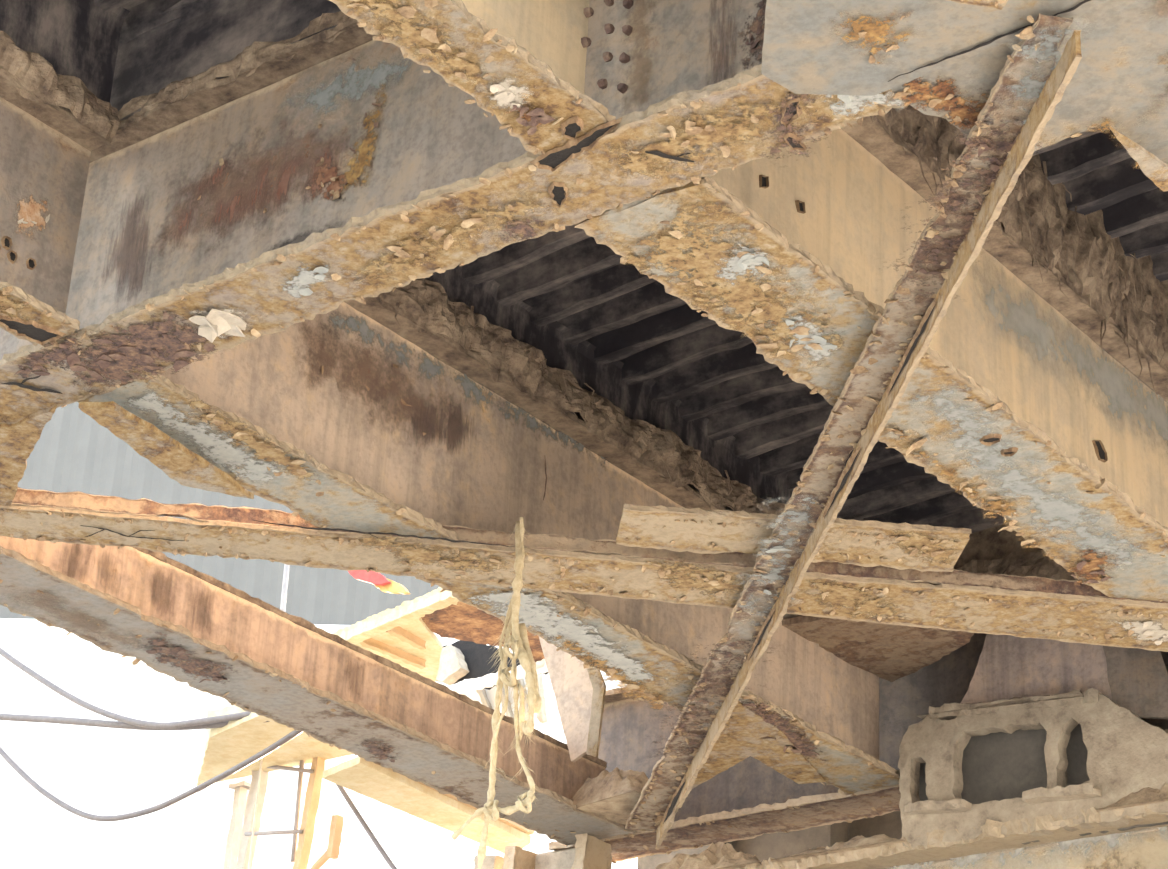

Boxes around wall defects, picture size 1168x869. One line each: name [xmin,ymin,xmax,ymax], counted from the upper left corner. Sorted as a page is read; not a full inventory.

corrosion [1007,15,1041,63]
peeling [0,194,50,270]
corrosion [357,192,545,291]
corrosion [609,83,863,380]
corrosion [850,77,1026,405]
corrosion [14,281,254,499]
corrosion [300,317,468,451]
corrosion [21,590,249,710]
corrosion [292,512,628,617]
corrosion [556,388,866,856]
corrosion [839,531,961,566]
corrosion [354,738,398,765]